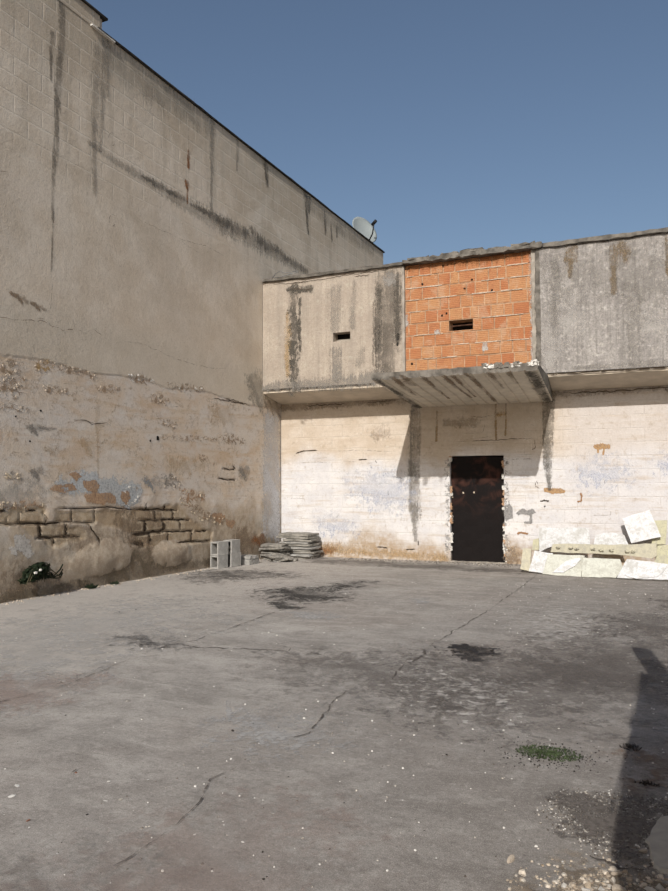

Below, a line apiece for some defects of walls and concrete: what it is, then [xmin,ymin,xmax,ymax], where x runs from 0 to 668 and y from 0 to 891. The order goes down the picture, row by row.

peeling [0,359,27,417]
peeling [35,359,121,392]
leakage [441,373,497,402]
peeling [150,418,246,445]
leakage [236,282,450,553]
peeling [50,470,142,509]
peeling [161,474,235,528]
peeling [444,456,475,561]
crack [279,690,346,747]
crack [115,768,234,865]